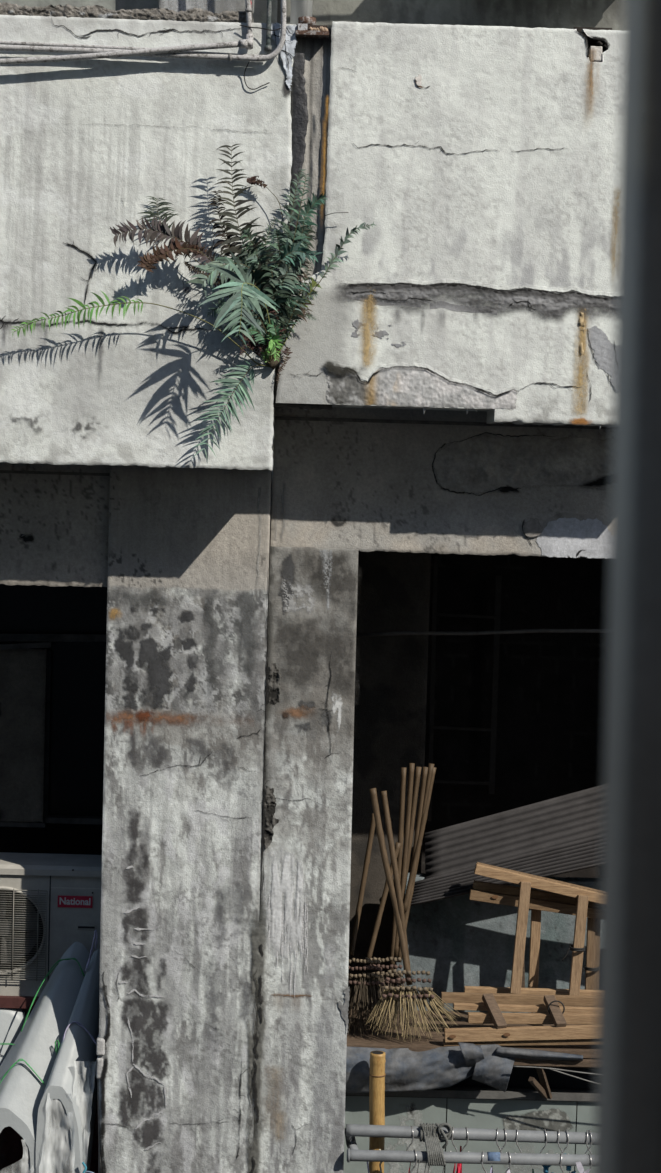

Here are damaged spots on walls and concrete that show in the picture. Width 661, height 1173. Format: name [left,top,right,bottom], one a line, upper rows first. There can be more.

crack [353,141,563,155]
crack [0,241,216,334]
corrosion [363,292,375,365]
flaking render [324,361,519,409]
flaking render [335,278,616,400]
corrosion [572,309,589,424]
peeling [522,512,610,559]
water stain [131,734,167,766]
corrosion [106,711,196,729]
water stain [188,739,208,759]
water stain [119,812,169,1173]
water stain [206,964,218,1037]